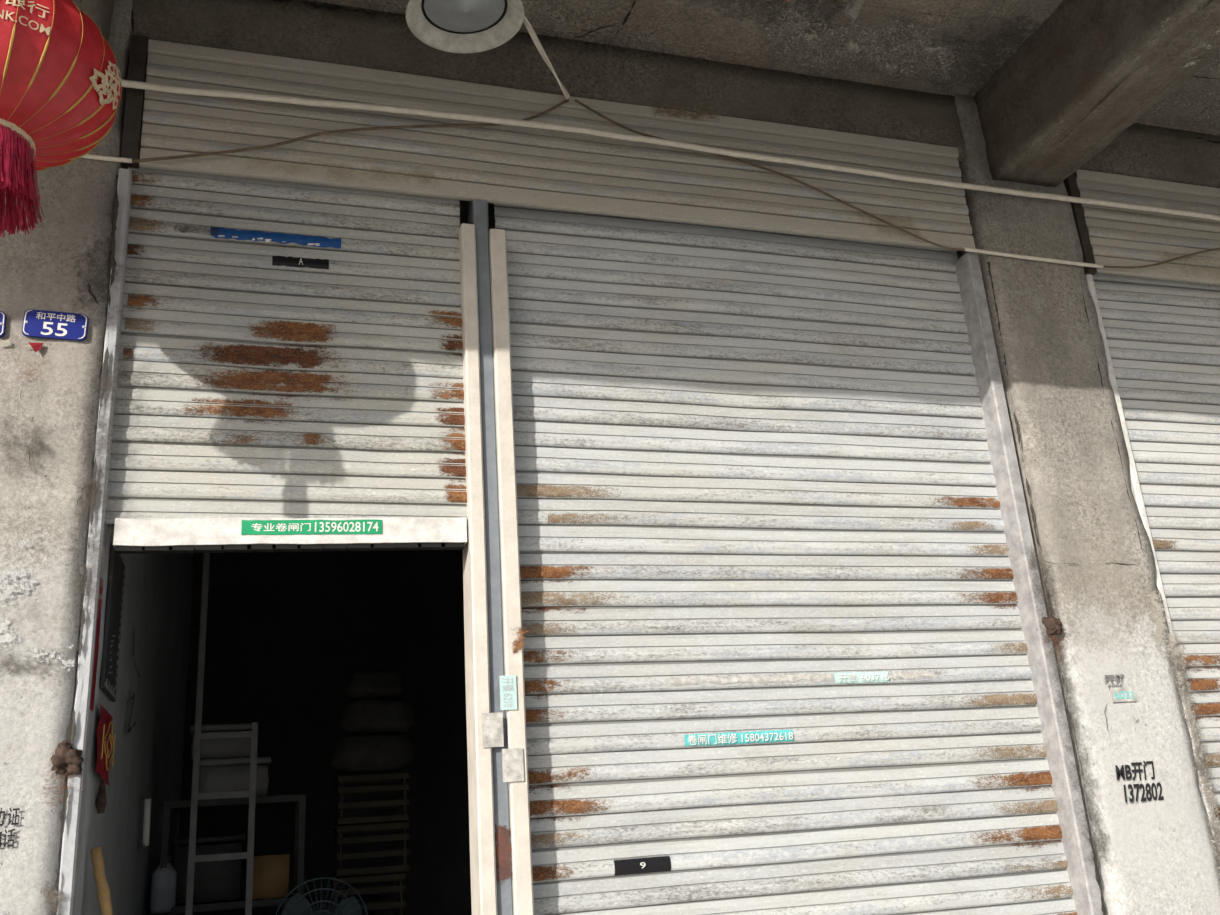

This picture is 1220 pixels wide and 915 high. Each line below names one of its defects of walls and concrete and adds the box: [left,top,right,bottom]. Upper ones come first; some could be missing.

crack [575,0,636,46]
corrosion [185,320,350,445]
corrosion [516,484,621,498]
corrosion [935,496,1018,609]
corrosion [512,566,622,664]
corrosion [524,679,567,723]
corrosion [929,693,1037,708]
corrosion [1183,655,1220,721]
corrosion [528,768,611,848]
corrosion [972,745,1062,848]
corrosion [532,864,573,881]
corrosion [1004,860,1073,900]